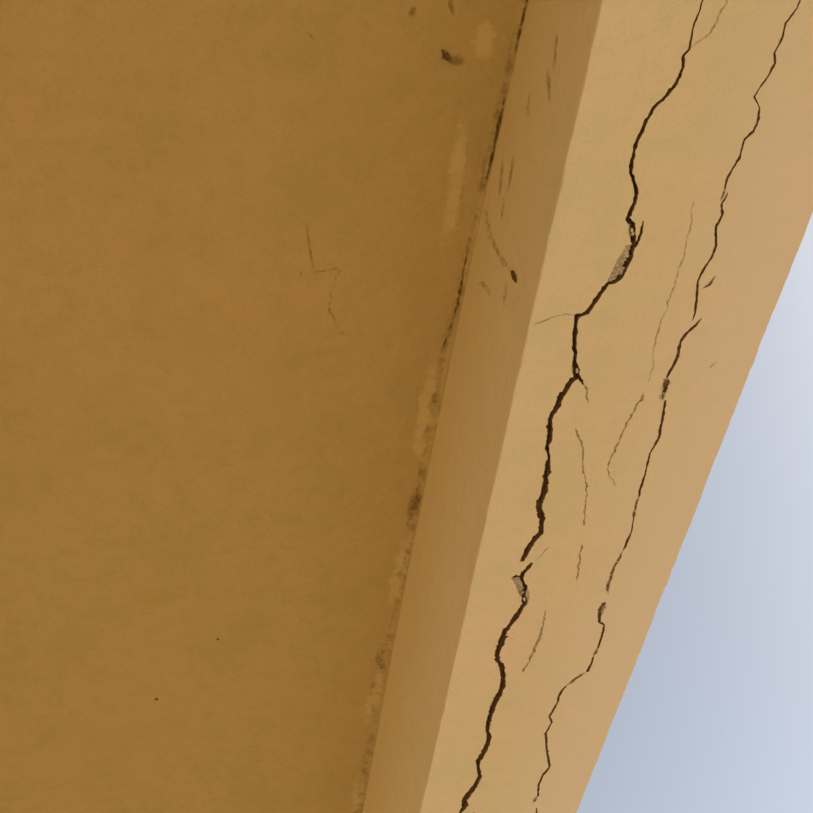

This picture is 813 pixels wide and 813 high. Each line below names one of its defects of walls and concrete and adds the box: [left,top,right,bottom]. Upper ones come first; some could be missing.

crack [444,258,466,345]
crack [459,0,703,813]
spalling [608,224,635,282]
crack [534,0,801,813]